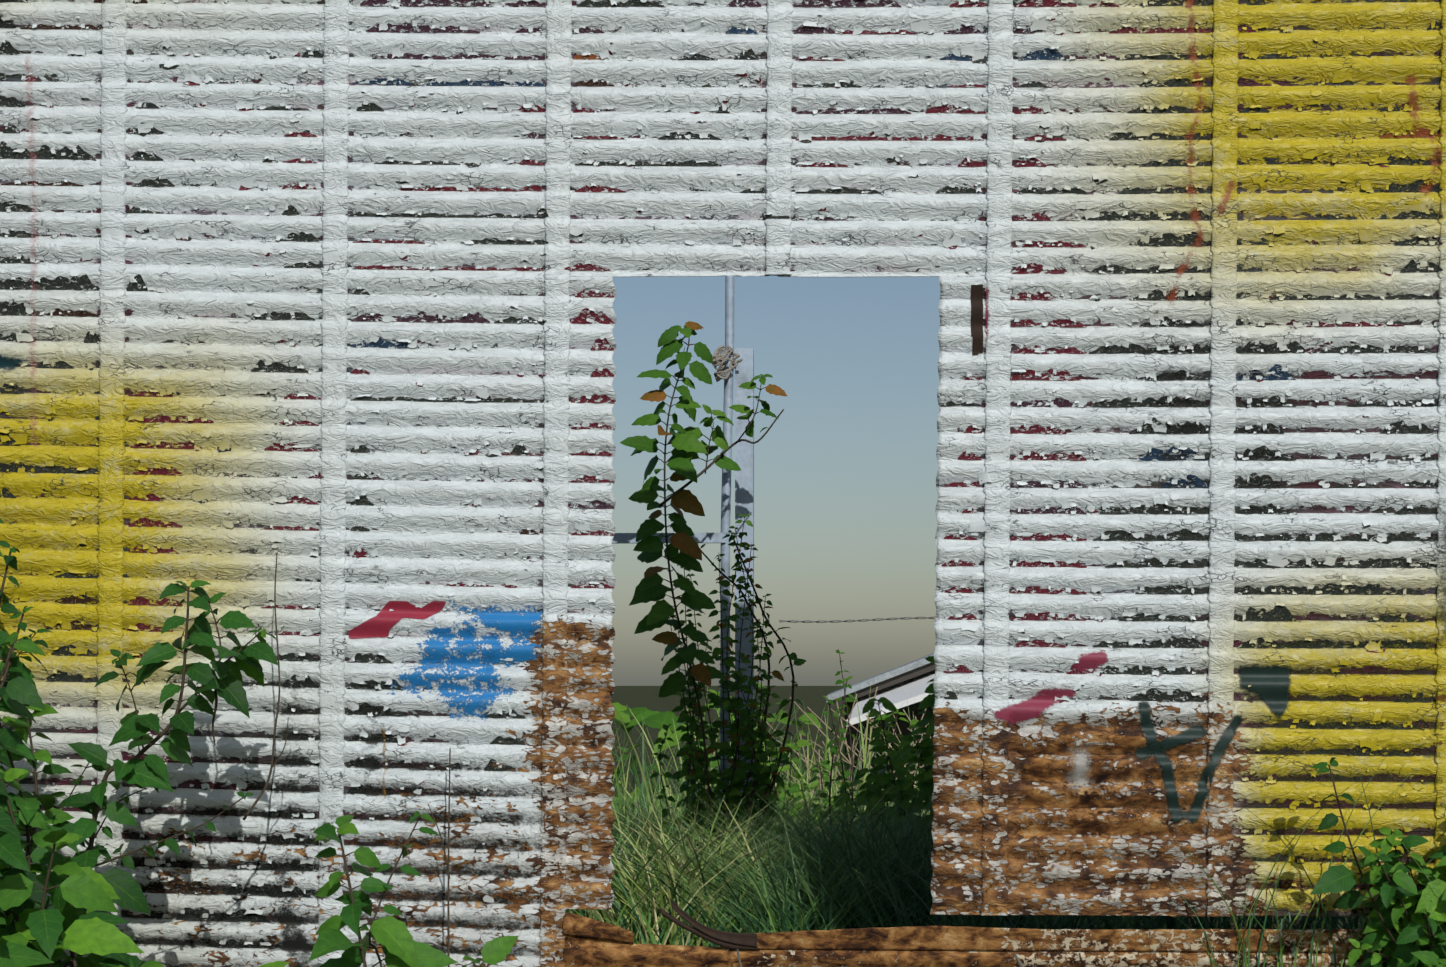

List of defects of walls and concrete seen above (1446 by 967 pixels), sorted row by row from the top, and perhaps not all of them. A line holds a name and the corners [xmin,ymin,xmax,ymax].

peeling [1014,0,1213,113]
peeling [0,179,100,343]
peeling [346,151,548,351]
peeling [1234,288,1443,488]
peeling [1237,478,1440,687]
peeling [1010,612,1204,703]
corrosion [349,836,441,850]
corrosion [491,893,582,904]
corrosion [494,762,608,800]
corrosion [492,817,611,879]
corrosion [523,707,609,746]
corrosion [936,721,1233,888]